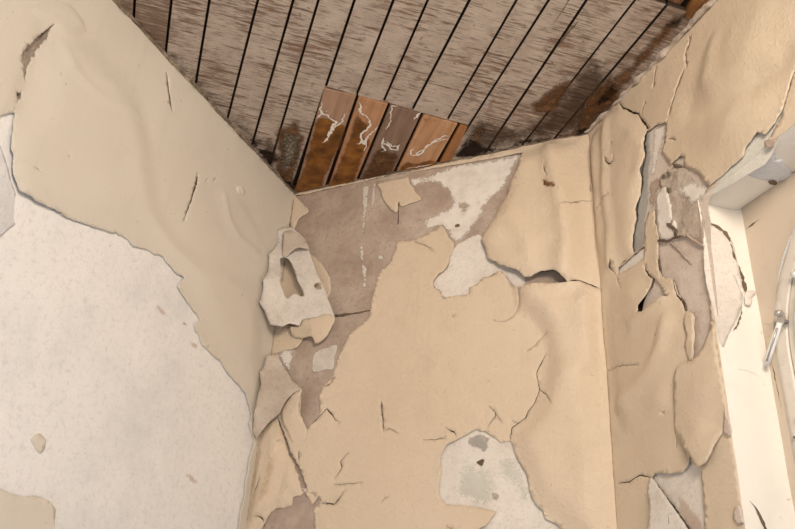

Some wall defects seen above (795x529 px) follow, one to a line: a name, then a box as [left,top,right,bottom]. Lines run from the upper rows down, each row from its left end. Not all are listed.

damp [455,16,684,157]
damp [252,102,446,192]
peeling [618,103,785,359]
peeling [0,113,254,529]
peeling [271,153,567,428]
peeling [262,488,326,529]
crack [277,419,355,505]
peeling [438,429,562,529]
crack [490,338,550,442]
peeling [723,405,732,436]
peeling [733,505,744,524]